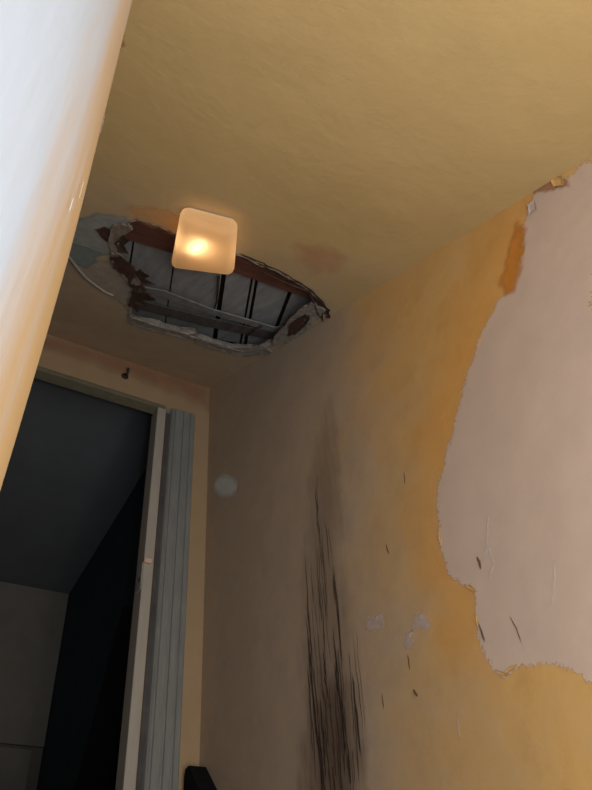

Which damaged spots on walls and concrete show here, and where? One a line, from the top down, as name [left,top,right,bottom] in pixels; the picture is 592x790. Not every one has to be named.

flaking render [68,214,330,357]
peeling [436,161,592,683]
water stain [305,523,365,790]